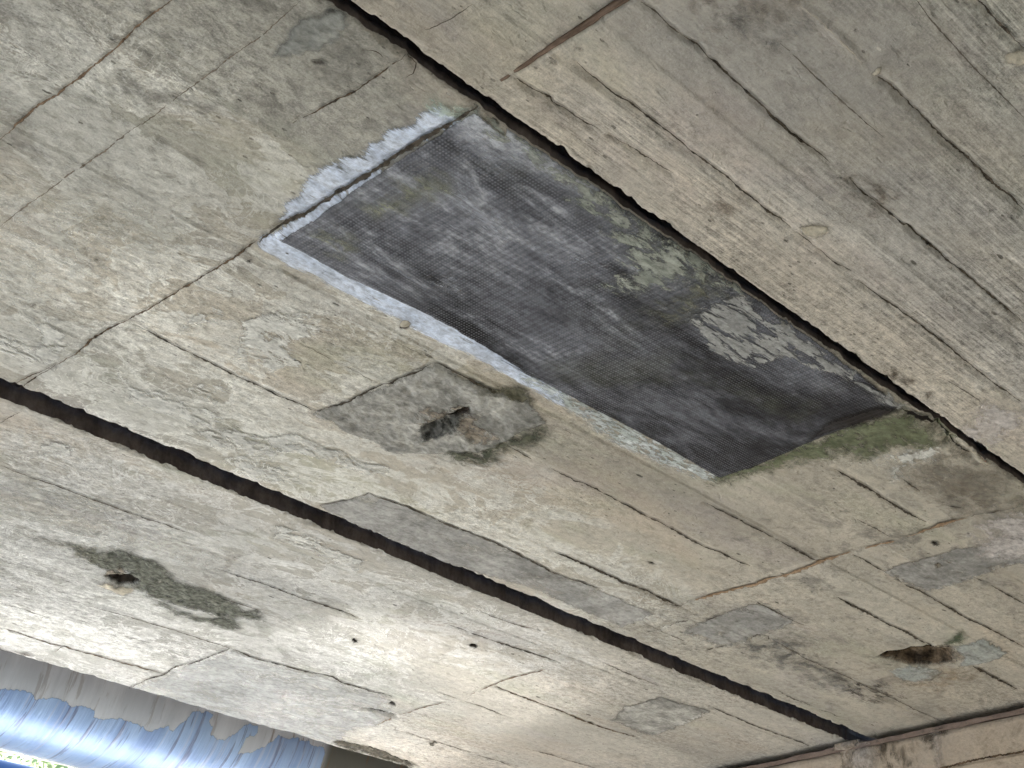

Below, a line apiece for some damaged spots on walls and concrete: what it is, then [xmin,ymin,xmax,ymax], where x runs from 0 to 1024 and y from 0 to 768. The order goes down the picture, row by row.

crack [293,50,416,123]
spalling [415,406,499,445]
crack [129,649,229,688]
spalling [880,644,963,664]